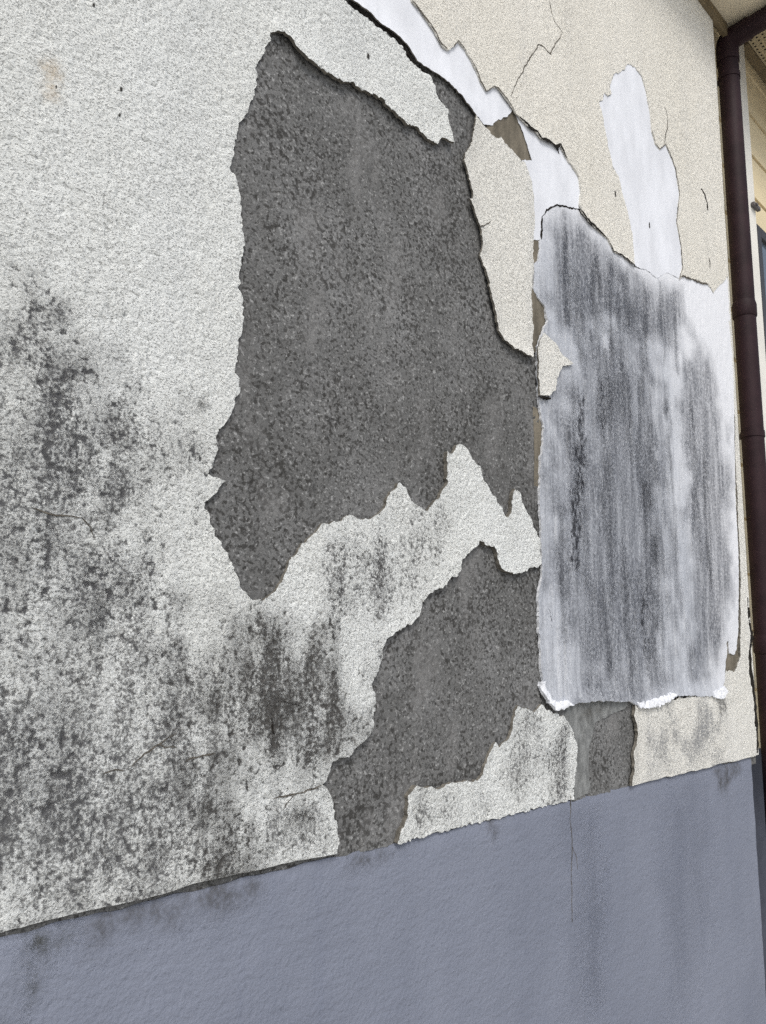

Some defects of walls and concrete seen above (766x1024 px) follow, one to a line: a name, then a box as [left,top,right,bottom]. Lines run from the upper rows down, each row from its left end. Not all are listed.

crack [412,0,567,157]
leakage [558,224,680,338]
leakage [0,277,456,927]
spalling [204,0,739,857]
leakage [559,349,662,698]
leakage [683,364,730,658]
leakage [499,709,573,805]
crack [570,795,578,921]